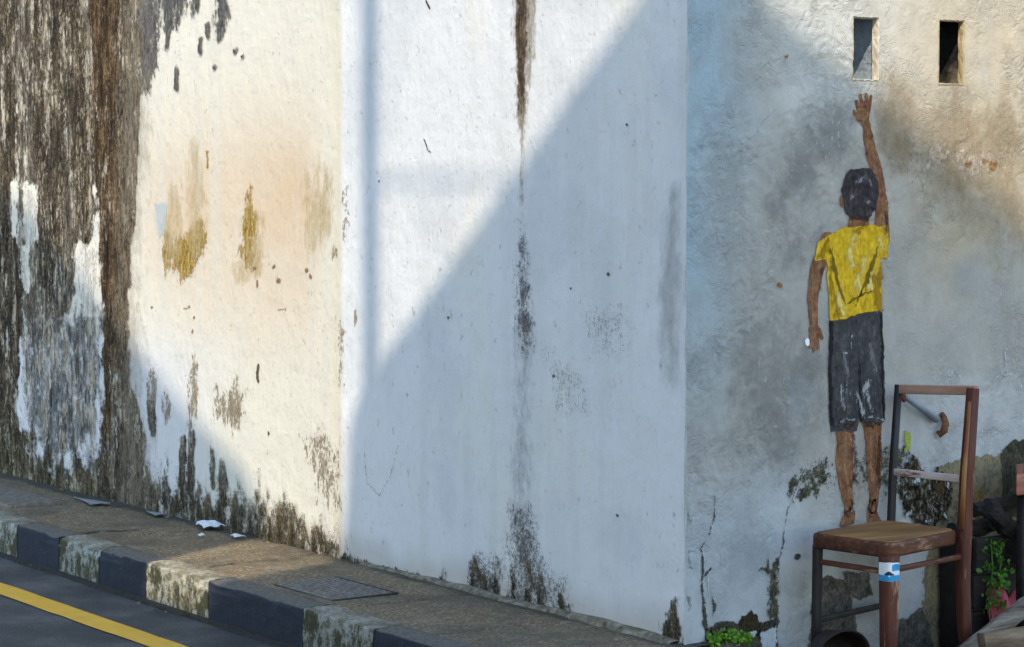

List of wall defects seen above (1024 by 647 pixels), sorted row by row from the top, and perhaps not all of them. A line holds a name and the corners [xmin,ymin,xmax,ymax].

damp [511,0,536,153]
damp [0,0,420,575]
damp [515,229,534,355]
crack [700,496,716,630]
crack [759,470,805,632]
flaking render [808,571,873,647]
flaking render [898,548,940,647]
flaking render [898,455,961,528]
flaking render [973,439,1024,503]